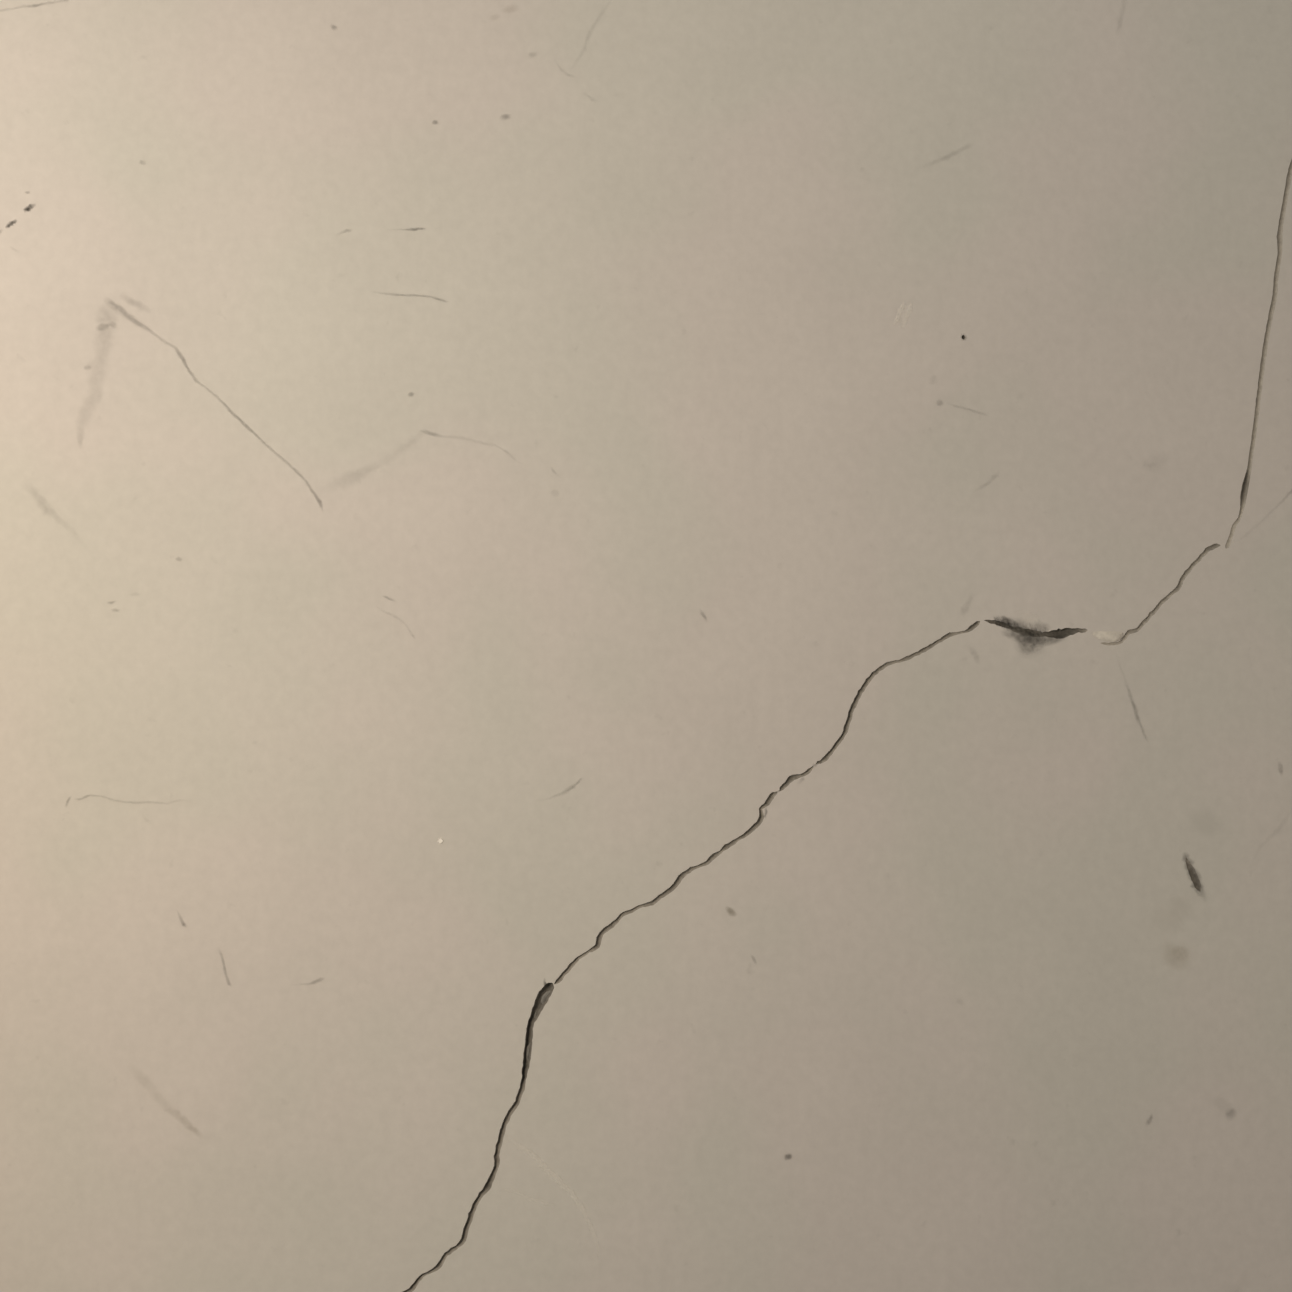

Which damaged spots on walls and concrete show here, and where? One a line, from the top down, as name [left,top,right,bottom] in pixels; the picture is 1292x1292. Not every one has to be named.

crack [1092,160,1292,645]
crack [403,621,980,1292]